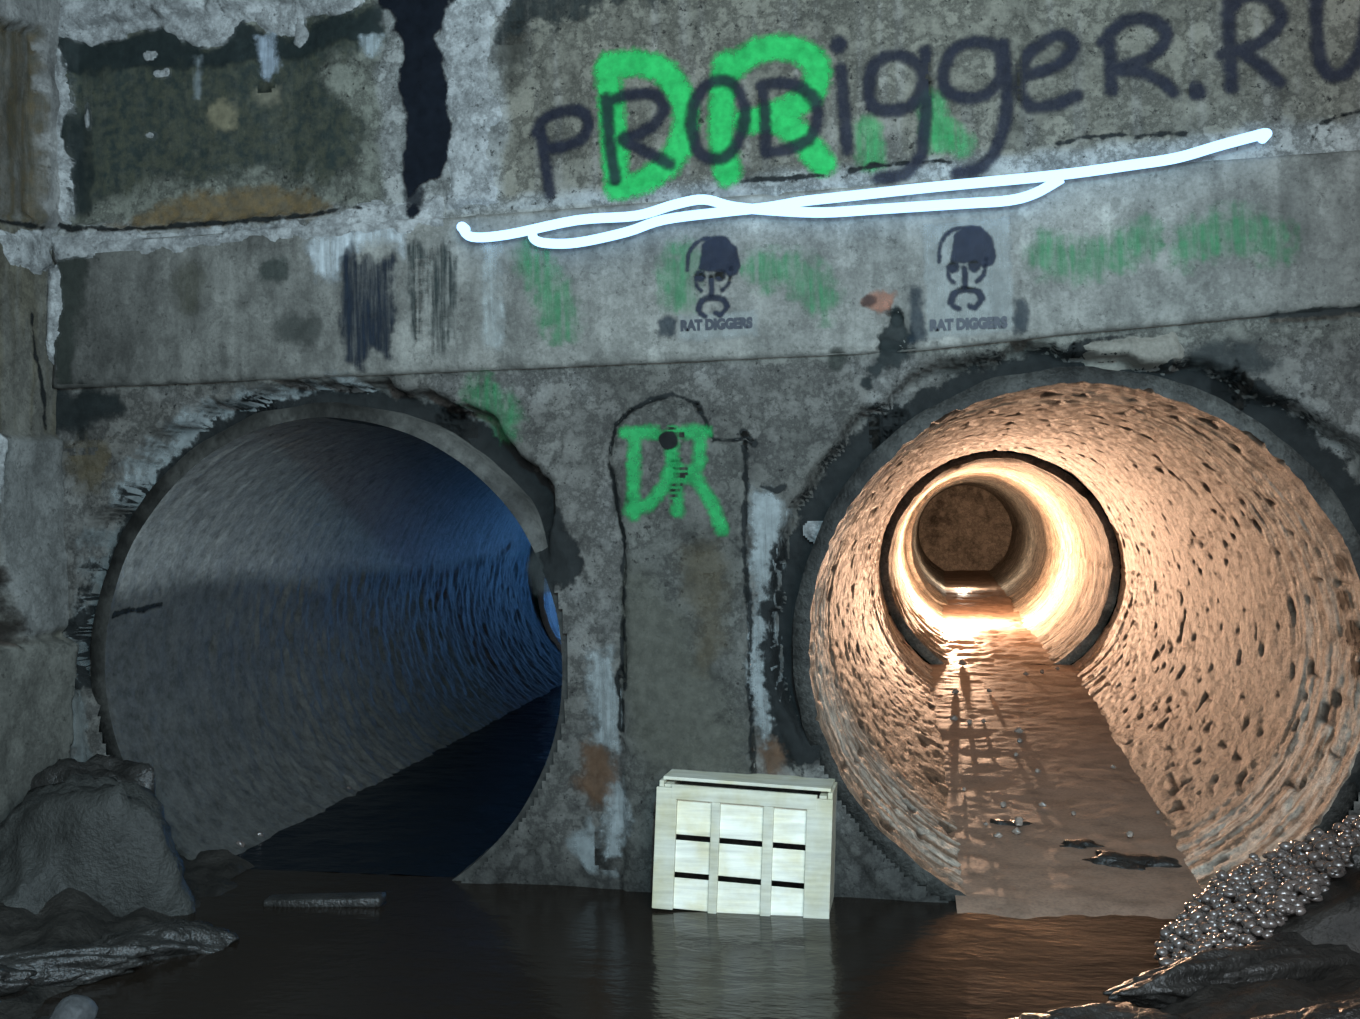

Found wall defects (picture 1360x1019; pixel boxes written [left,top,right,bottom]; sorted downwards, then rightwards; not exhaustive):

flaking render [0,0,511,370]
leakage [404,187,424,218]
leakage [54,257,126,439]
leakage [111,229,456,507]